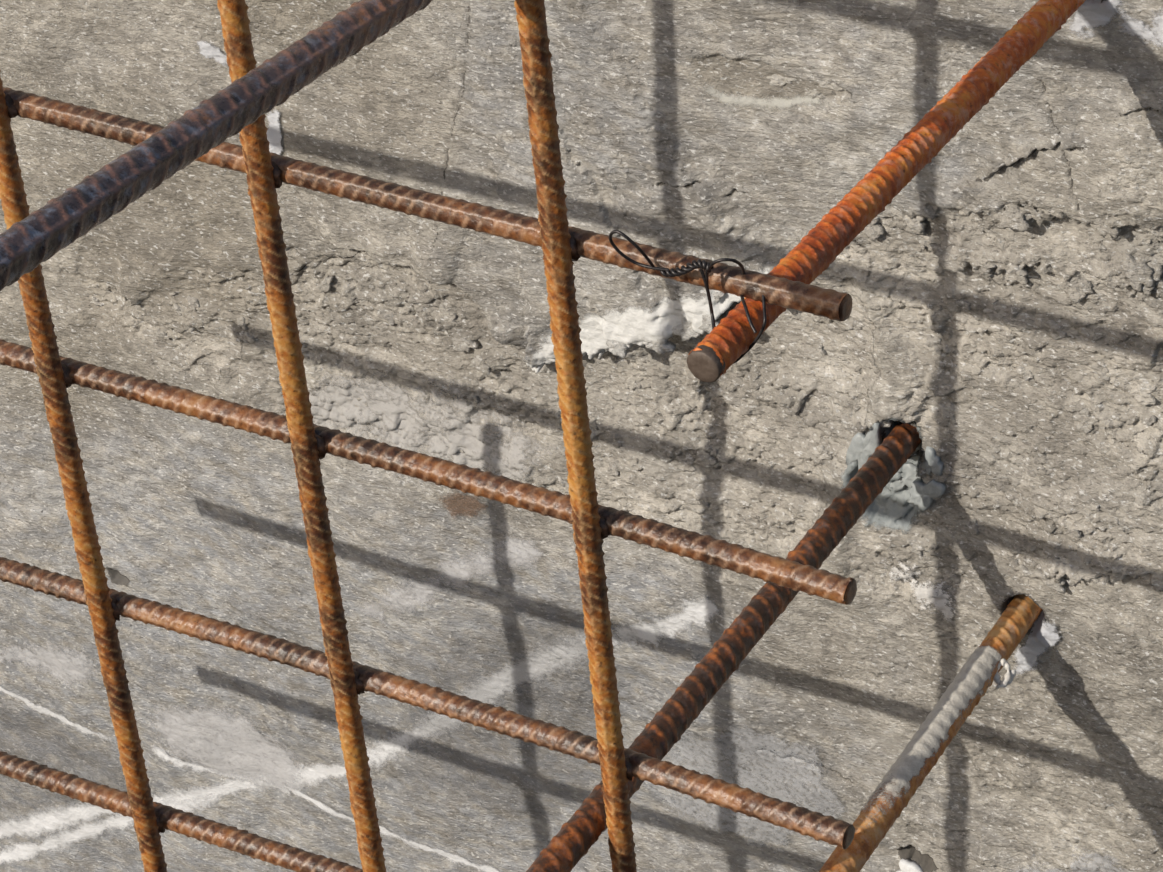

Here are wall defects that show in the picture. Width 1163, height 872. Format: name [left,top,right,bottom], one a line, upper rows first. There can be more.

spalling [0,0,857,872]
spalling [579,0,1163,872]
crack [976,80,1087,210]
damp [1069,0,1163,47]